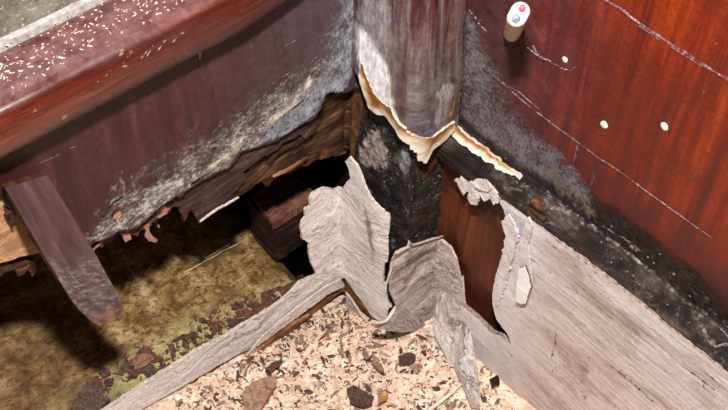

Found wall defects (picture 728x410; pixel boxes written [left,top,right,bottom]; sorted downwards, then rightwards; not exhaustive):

leakage [89,0,397,240]
leakage [414,84,454,137]
leakage [399,147,410,174]
peeling [454,176,499,205]
leakage [460,16,728,330]
peeling [398,352,416,365]